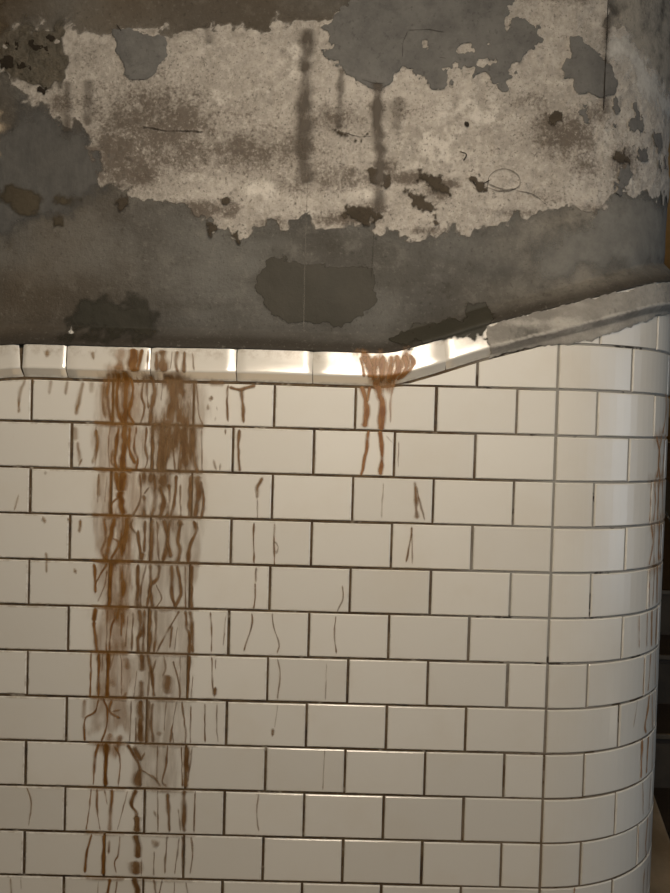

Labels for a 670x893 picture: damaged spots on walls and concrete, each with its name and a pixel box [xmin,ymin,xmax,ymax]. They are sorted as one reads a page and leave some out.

damp [297,30,313,182]
flaking render [0,0,670,244]
damp [372,83,386,212]
damp [255,255,377,328]
rust [211,381,255,471]
rust [360,351,416,475]
rust [83,348,205,893]